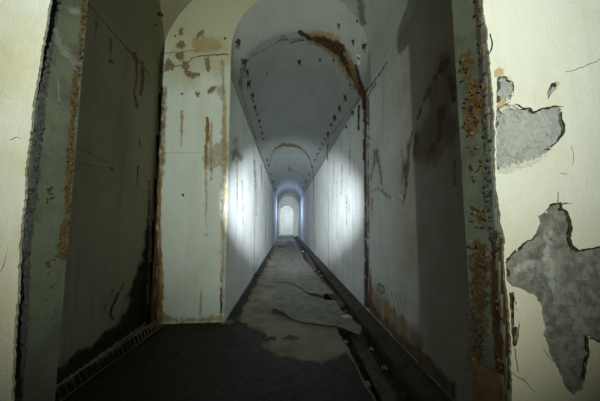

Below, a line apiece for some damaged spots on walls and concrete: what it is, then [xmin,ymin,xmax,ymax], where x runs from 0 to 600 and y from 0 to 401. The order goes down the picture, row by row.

corrosion [45,0,87,275]
corrosion [147,87,167,324]
crack [88,3,229,74]
spalling [163,28,211,79]
peeling [195,85,225,97]
corrosion [267,94,347,191]
corrosion [282,23,387,308]
corrosion [460,49,482,136]
spalling [474,0,600,401]
damp [55,190,374,401]
corrosion [466,239,491,371]